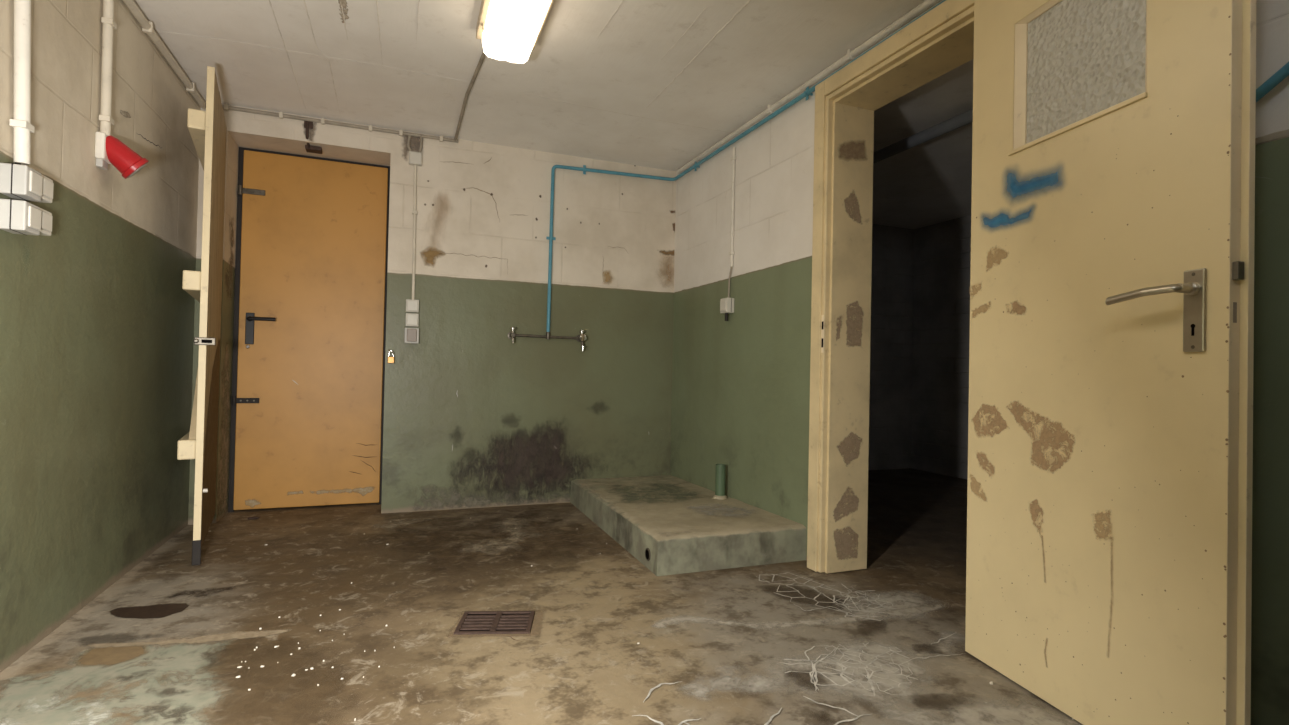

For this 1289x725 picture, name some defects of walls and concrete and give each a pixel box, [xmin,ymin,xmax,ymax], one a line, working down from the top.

leakage [386,425,590,570]
crack [634,573,965,725]